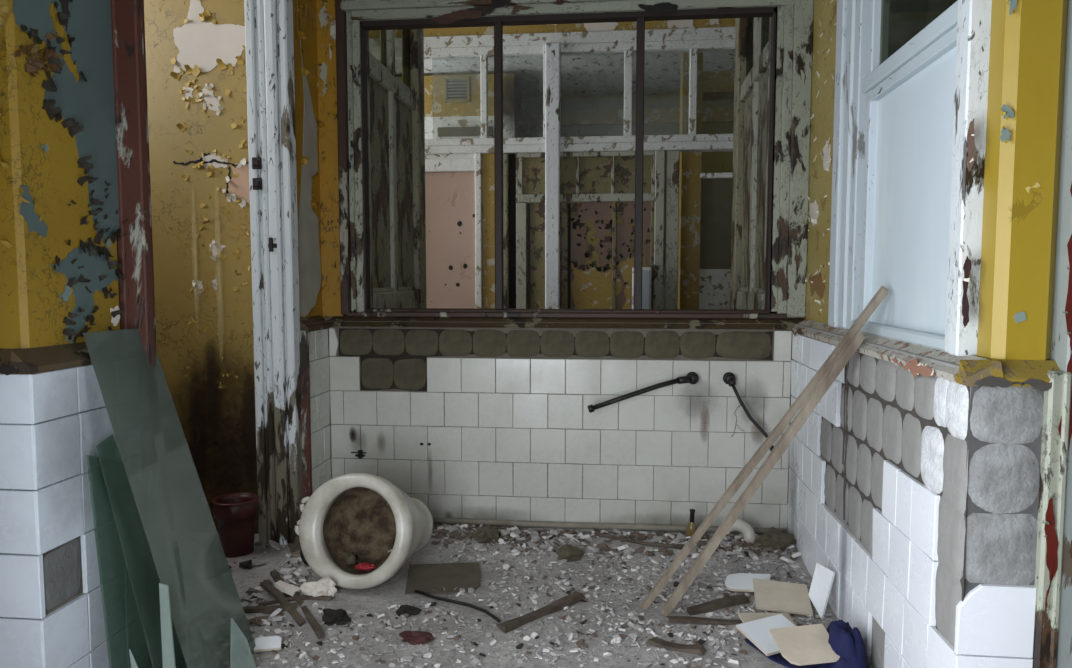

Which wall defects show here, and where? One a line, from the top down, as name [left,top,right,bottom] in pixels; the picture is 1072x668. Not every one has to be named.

peeling [170,0,247,117]
peeling [0,0,128,343]
crack [173,152,249,197]
peeling [181,139,250,251]
peeling [967,115,975,172]
peeling [1000,104,1014,143]
peeling [190,240,240,296]
peeling [960,256,972,328]
peeling [1013,311,1026,323]
peeling [1058,234,1072,451]
water stain [169,347,258,533]
peeling [820,352,1072,647]